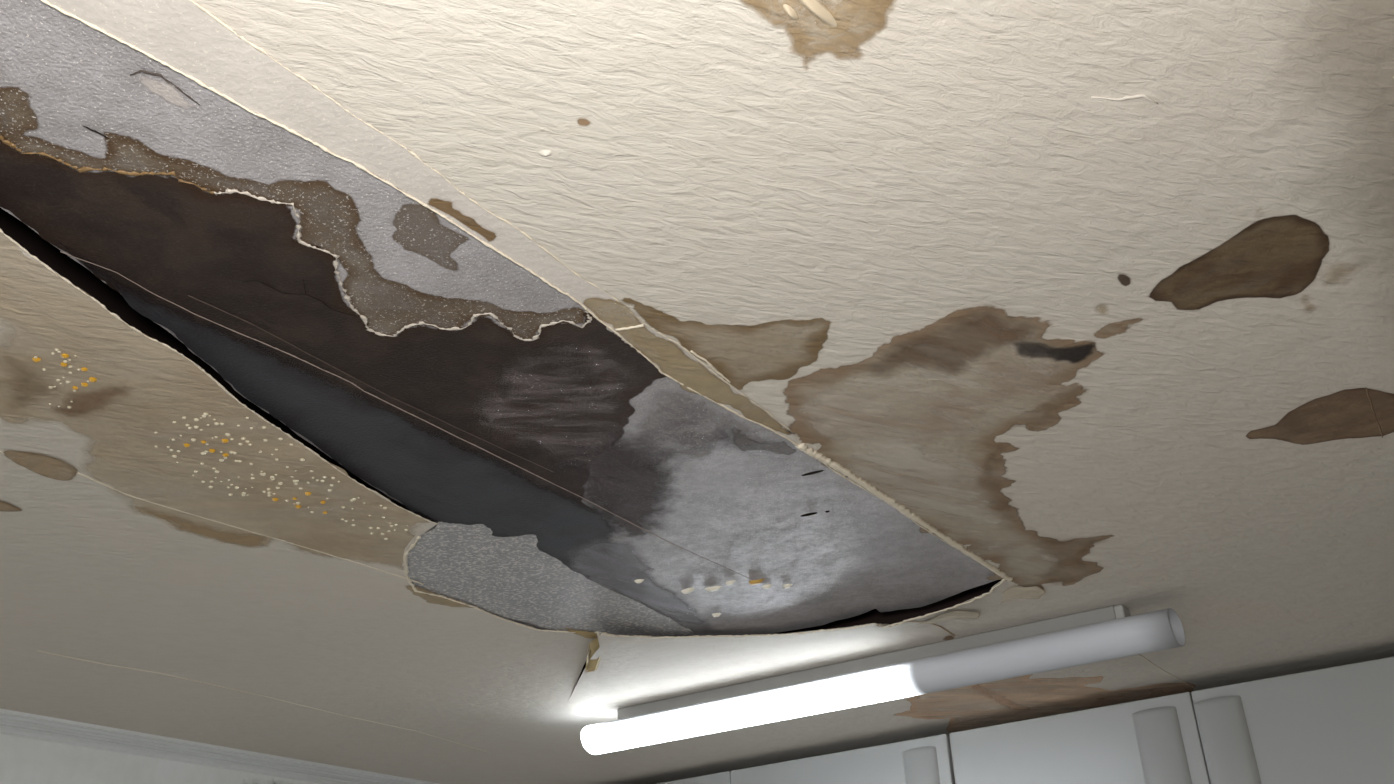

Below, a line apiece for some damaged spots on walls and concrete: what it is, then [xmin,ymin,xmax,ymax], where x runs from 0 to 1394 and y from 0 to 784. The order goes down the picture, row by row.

leakage [742,0,894,64]
leakage [1149,215,1329,310]
peeling [0,0,1048,703]
leakage [0,87,1142,631]
leakage [1246,387,1394,445]